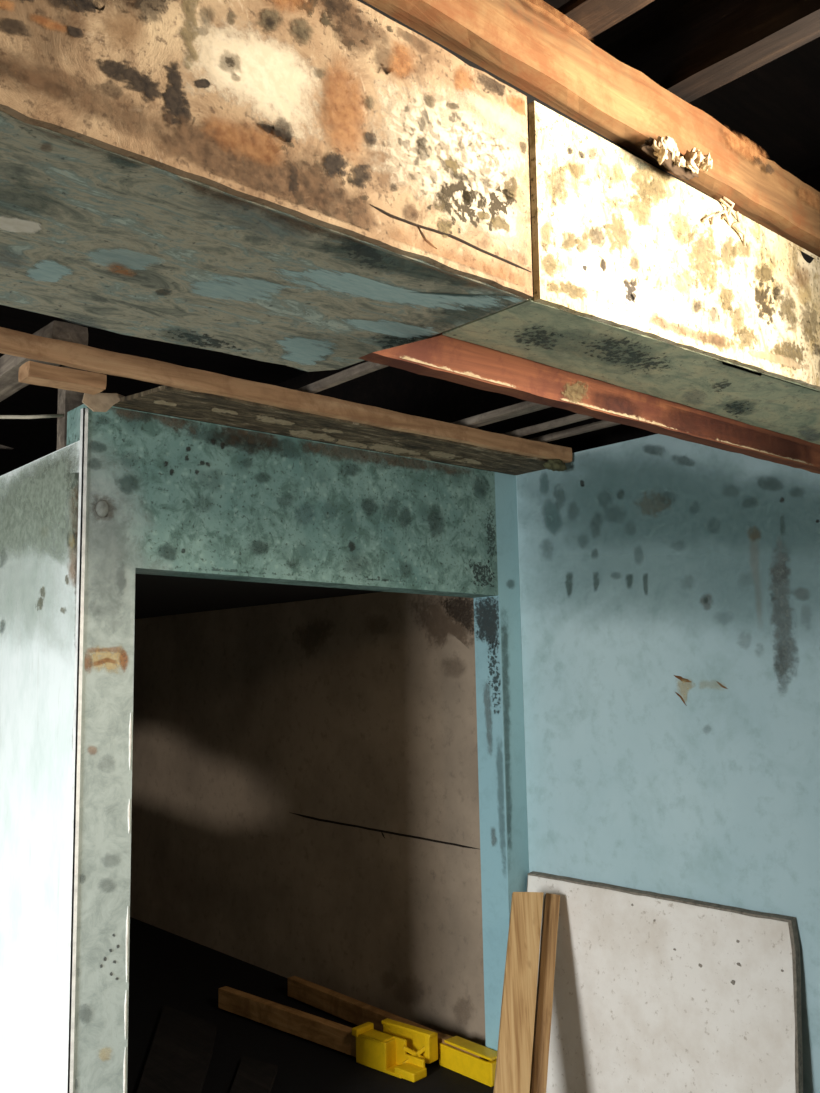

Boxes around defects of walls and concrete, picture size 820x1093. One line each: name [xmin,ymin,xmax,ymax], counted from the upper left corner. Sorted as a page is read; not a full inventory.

damp [258,0,425,51]
damp [98,0,373,230]
peeling [0,217,40,232]
crack [369,204,531,272]
damp [405,159,523,246]
damp [542,162,668,303]
peeling [27,260,72,282]
peeling [191,269,522,311]
damp [687,222,806,370]
peeling [277,336,335,365]
peeling [347,319,438,338]
corrosion [85,650,128,669]